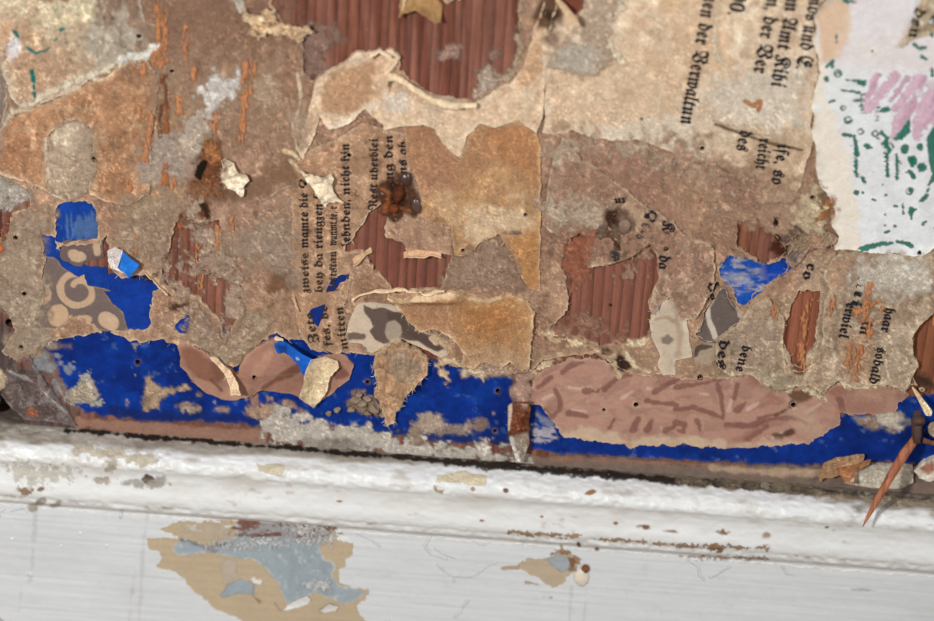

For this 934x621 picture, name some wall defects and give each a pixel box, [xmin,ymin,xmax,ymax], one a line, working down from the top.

peeling [436,44,462,61]
peeling [289,20,334,151]
peeling [219,158,249,197]
peeling [533,194,609,235]
peeling [107,247,158,281]
peeling [625,337,651,374]
peeling [913,374,934,391]
peeling [507,401,531,462]
spalling [73,440,159,484]
spalling [257,464,284,476]
peeling [147,520,369,621]
peeling [502,545,580,598]